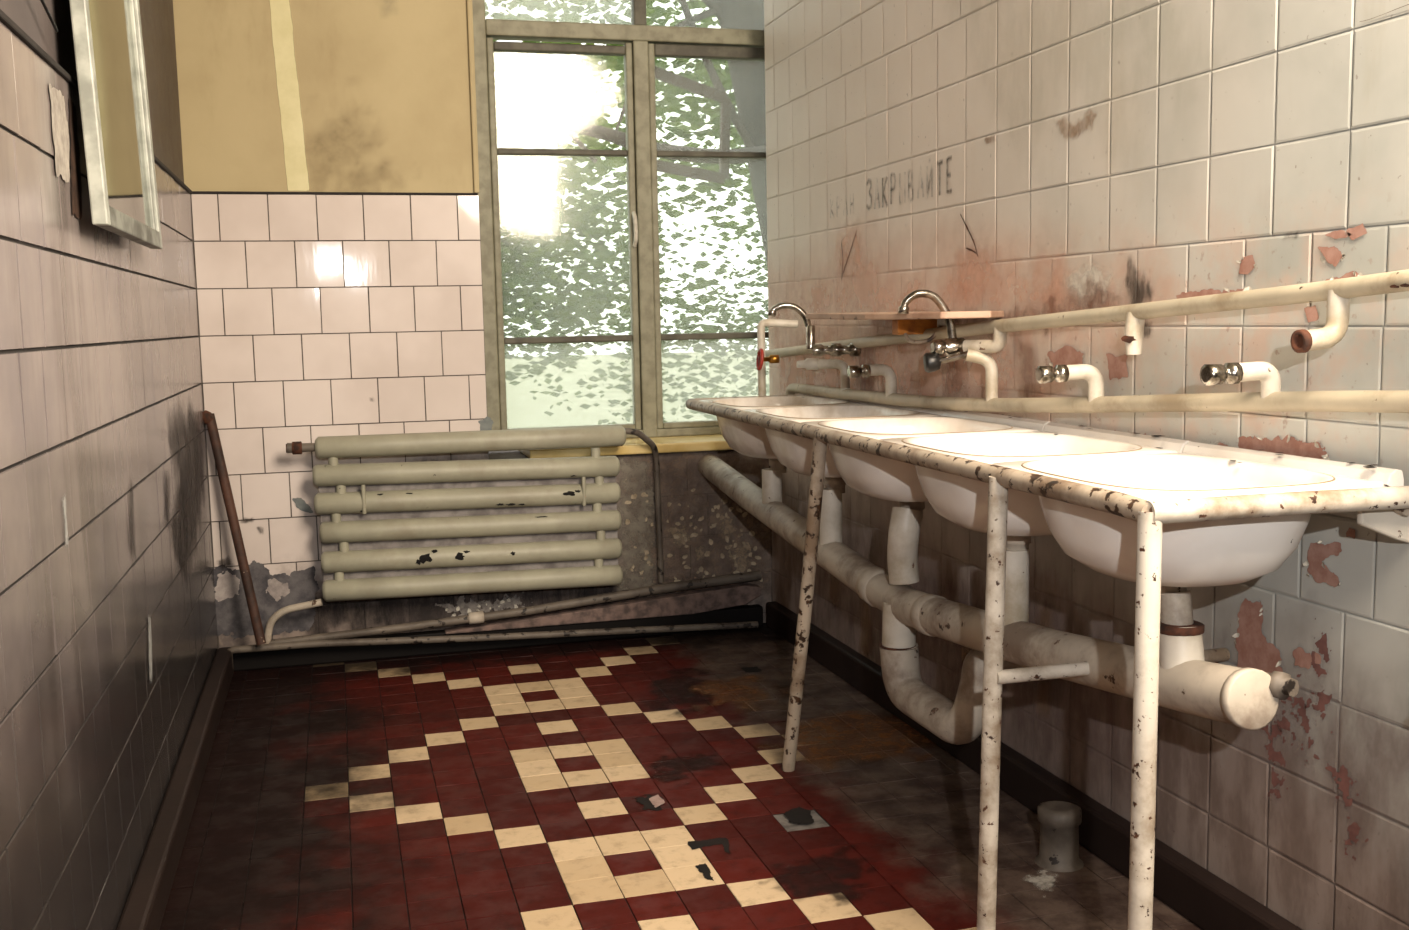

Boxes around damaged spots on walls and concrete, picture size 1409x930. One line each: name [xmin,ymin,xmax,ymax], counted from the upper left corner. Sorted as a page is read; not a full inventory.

peeling [1176,255,1256,299]
peeling [1318,223,1367,281]
peeling [1047,345,1084,368]
peeling [1106,336,1136,380]
peeling [1218,433,1330,460]
peeling [1303,528,1355,587]
spalling [213,560,320,640]
peeling [1232,598,1321,673]